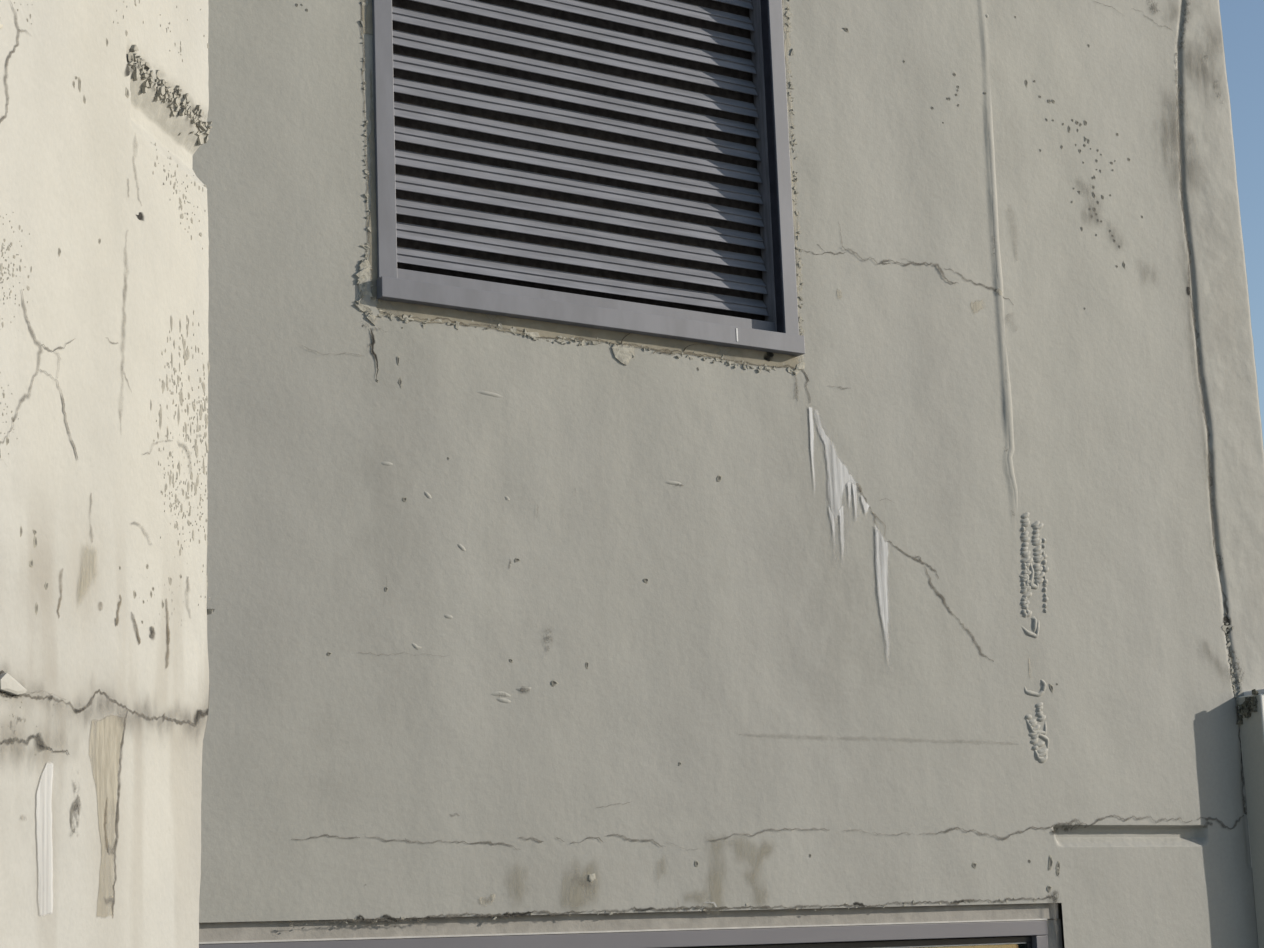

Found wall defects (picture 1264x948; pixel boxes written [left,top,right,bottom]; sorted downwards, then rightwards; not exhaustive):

spalling [113,0,212,145]
spalling [153,143,206,250]
spalling [353,0,809,397]
crack [813,246,1006,299]
crack [0,378,78,459]
water stain [809,407,869,548]
water stain [875,527,888,640]
crack [856,483,989,659]
crack [1172,407,1247,829]
water stain [36,763,53,914]
crack [0,671,208,913]
crack [941,815,1139,840]